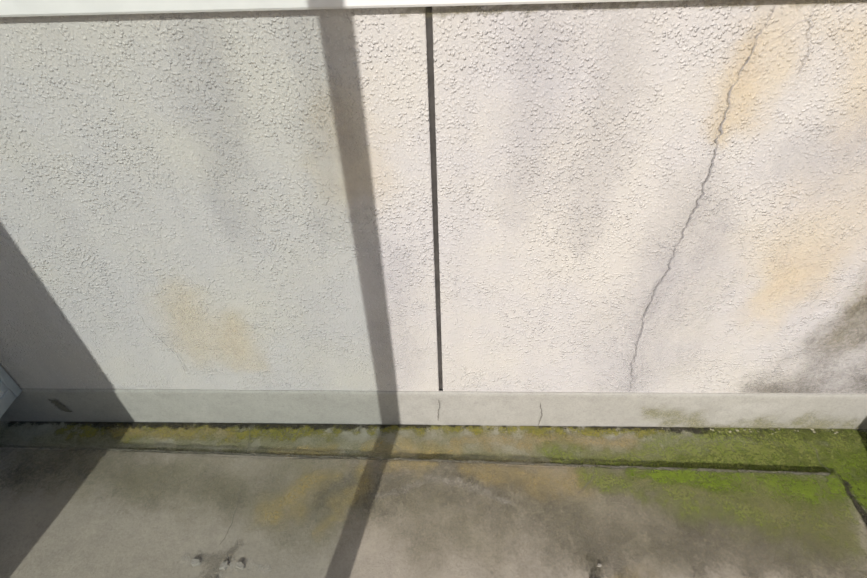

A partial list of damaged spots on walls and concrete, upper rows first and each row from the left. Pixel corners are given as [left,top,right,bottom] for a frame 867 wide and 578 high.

crack [629,7,775,392]
crack [191,483,245,578]
crack [585,555,602,578]